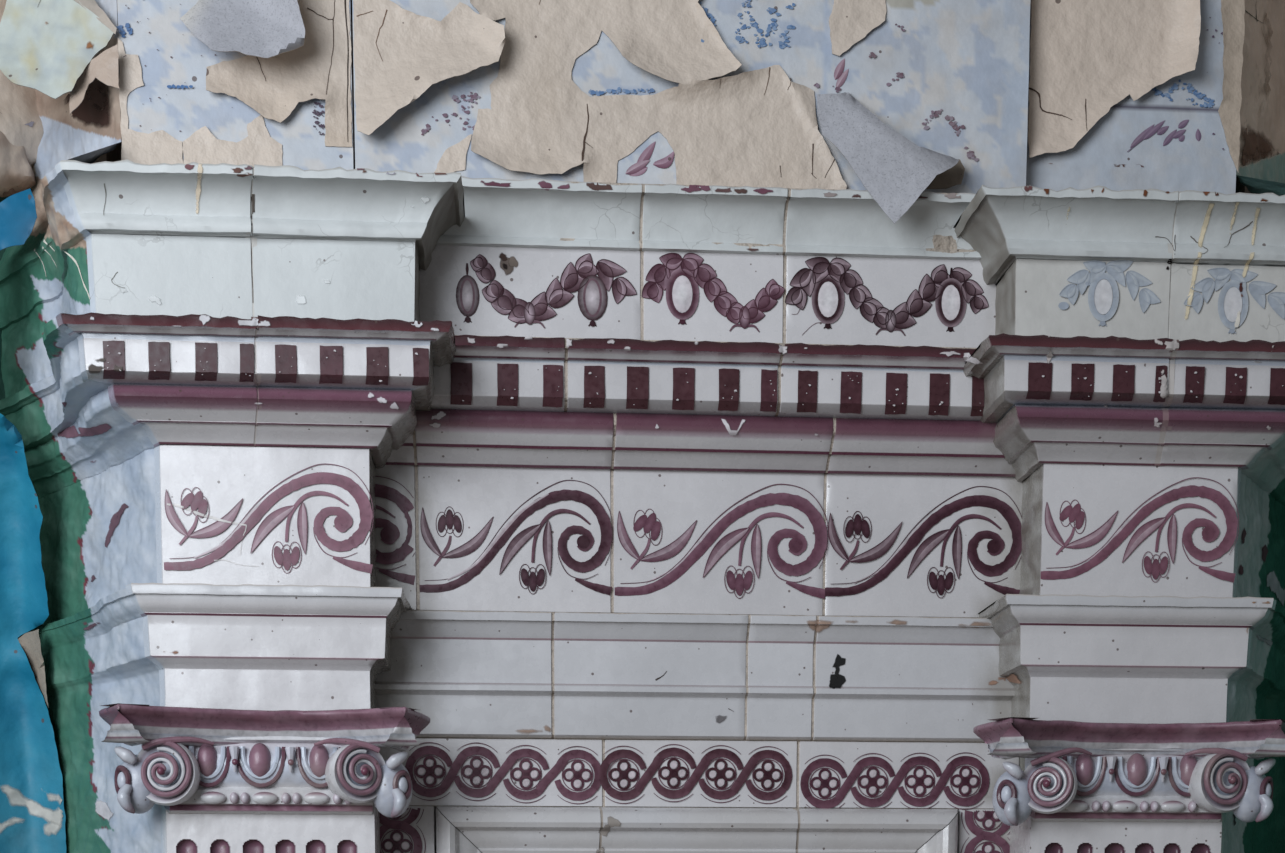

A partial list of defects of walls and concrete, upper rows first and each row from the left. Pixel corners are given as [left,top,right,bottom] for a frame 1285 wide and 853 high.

peeling [829,0,886,56]
peeling [118,0,861,198]
peeling [1028,0,1201,158]
peeling [0,189,37,251]
peeling [238,318,270,326]
spalling [88,358,123,373]
peeling [1160,370,1169,398]
peeling [58,424,111,438]
peeling [105,503,128,547]
peeling [0,413,67,853]
spalling [829,654,846,689]
peeling [95,801,113,820]